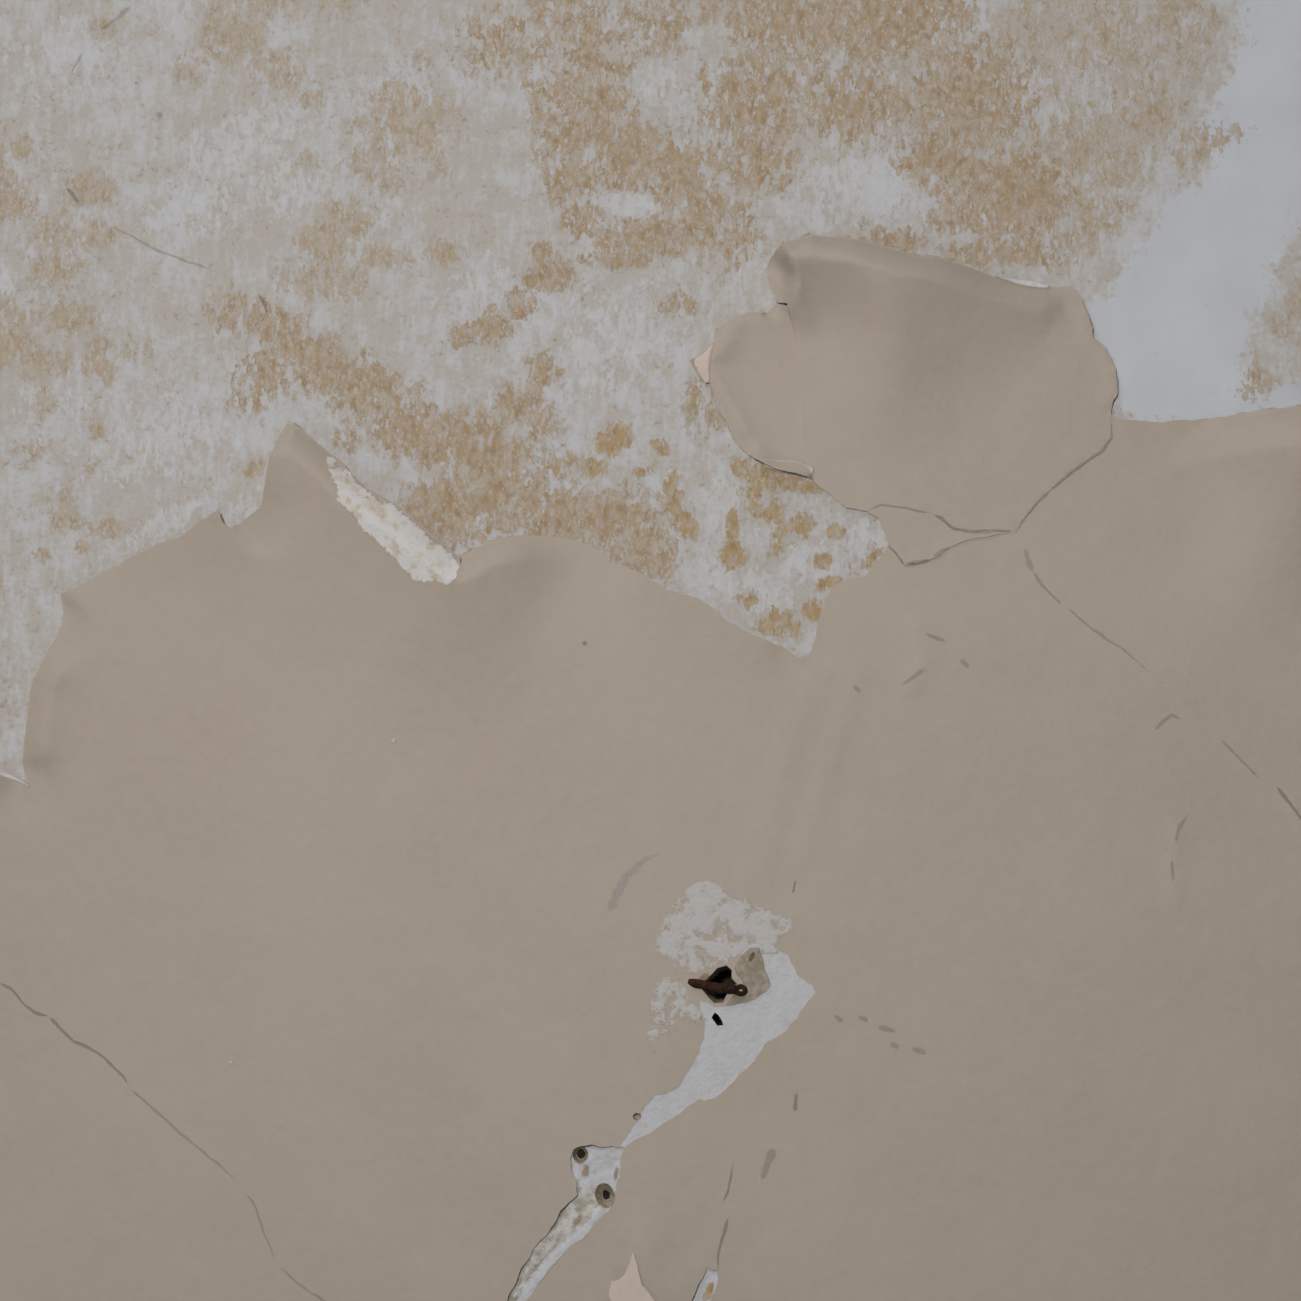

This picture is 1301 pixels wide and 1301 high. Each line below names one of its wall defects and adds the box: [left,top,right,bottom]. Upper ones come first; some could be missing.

peeling [264,422,468,640]
peeling [690,233,1118,565]
peeling [1208,404,1301,480]
damp [1229,221,1301,410]
peeling [0,634,103,860]
spalling [508,877,815,1301]